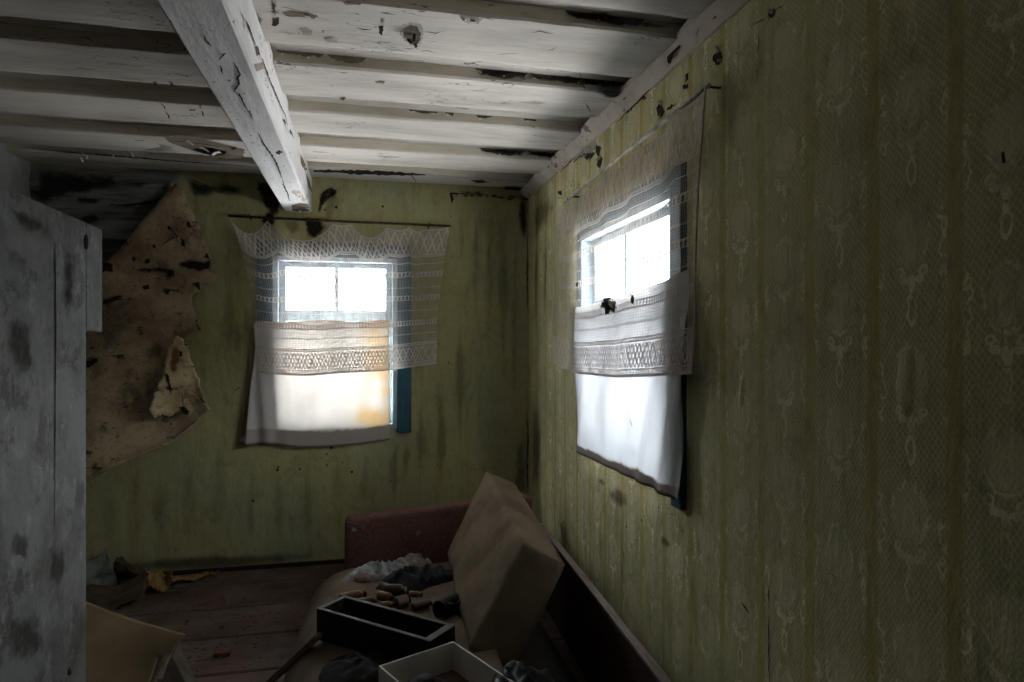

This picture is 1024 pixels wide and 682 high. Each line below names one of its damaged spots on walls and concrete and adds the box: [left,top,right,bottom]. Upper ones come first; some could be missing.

peeling [282,11,317,36]
peeling [565,10,644,26]
peeling [276,37,366,65]
peeling [475,68,626,100]
peeling [165,135,254,159]
peeling [480,148,556,158]
damp [190,182,239,195]
damp [258,183,280,227]
peeling [291,203,311,213]
damp [305,188,338,237]